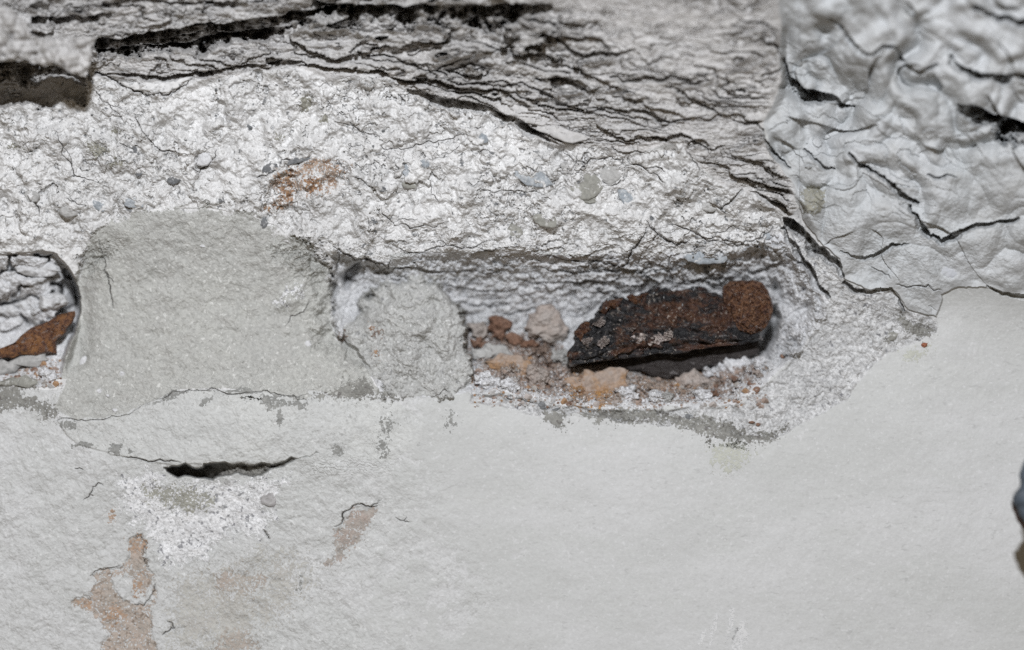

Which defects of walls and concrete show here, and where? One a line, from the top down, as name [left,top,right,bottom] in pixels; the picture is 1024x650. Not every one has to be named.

crack [761,40,782,78]
crack [92,72,217,173]
corrosion [261,152,353,213]
crack [333,121,509,284]
spalling [0,6,937,441]
crack [563,150,666,186]
crack [547,220,779,267]
corrosion [599,293,649,315]
corrosion [0,311,75,359]
corrosion [463,321,757,413]
crack [126,457,294,480]